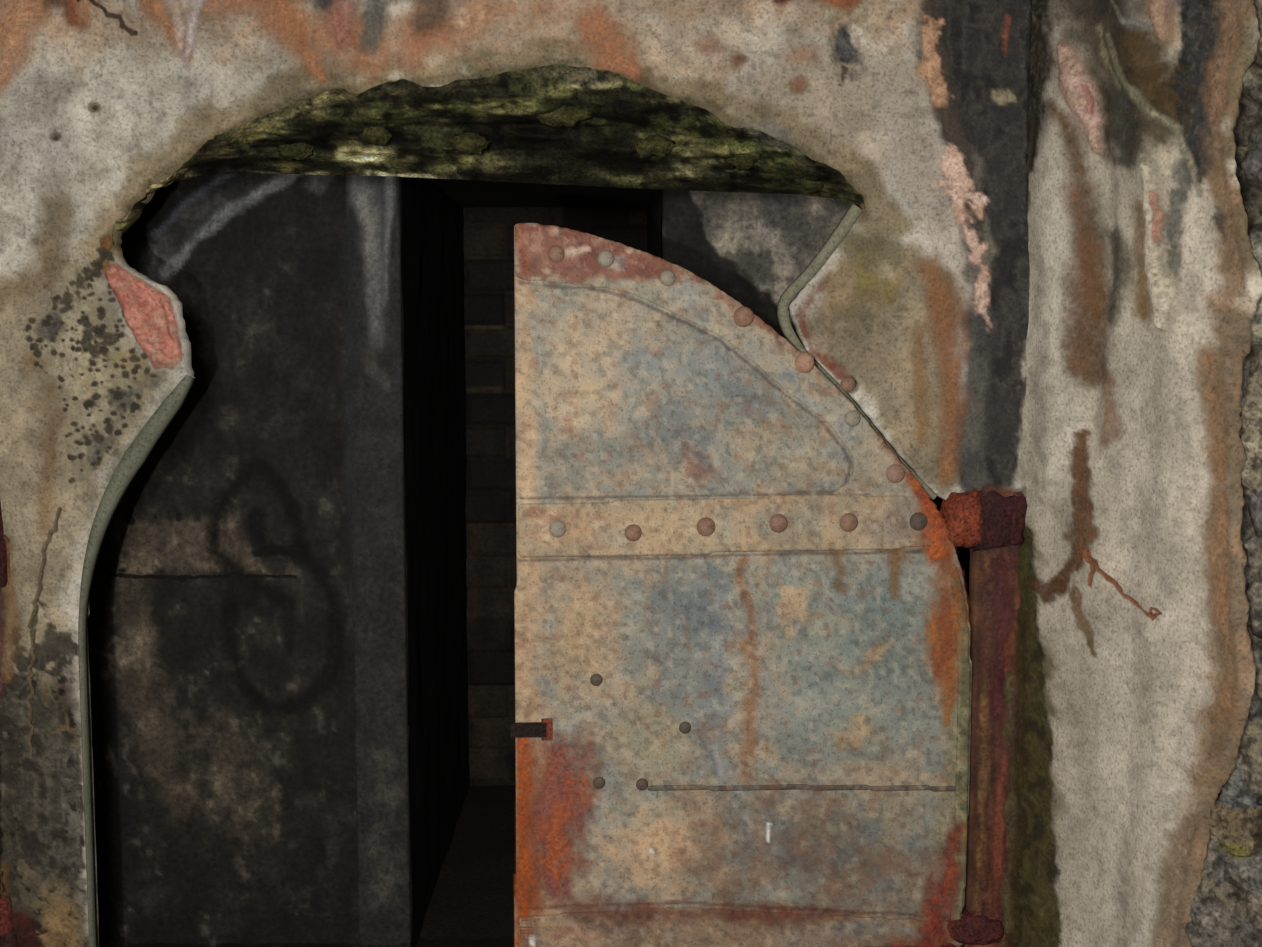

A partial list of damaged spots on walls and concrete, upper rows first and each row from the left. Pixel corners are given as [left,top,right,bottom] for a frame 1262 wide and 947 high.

corrosion [0,0,88,91]
corrosion [403,0,578,67]
corrosion [579,9,639,77]
peeling [916,15,948,107]
peeling [992,89,1016,105]
spalling [25,64,864,483]
corrosion [914,260,964,483]
peeling [937,144,991,323]
damp [919,0,1054,493]
corrosion [1047,101,1148,442]
corrosion [891,430,1098,947]
corrosion [515,737,592,947]